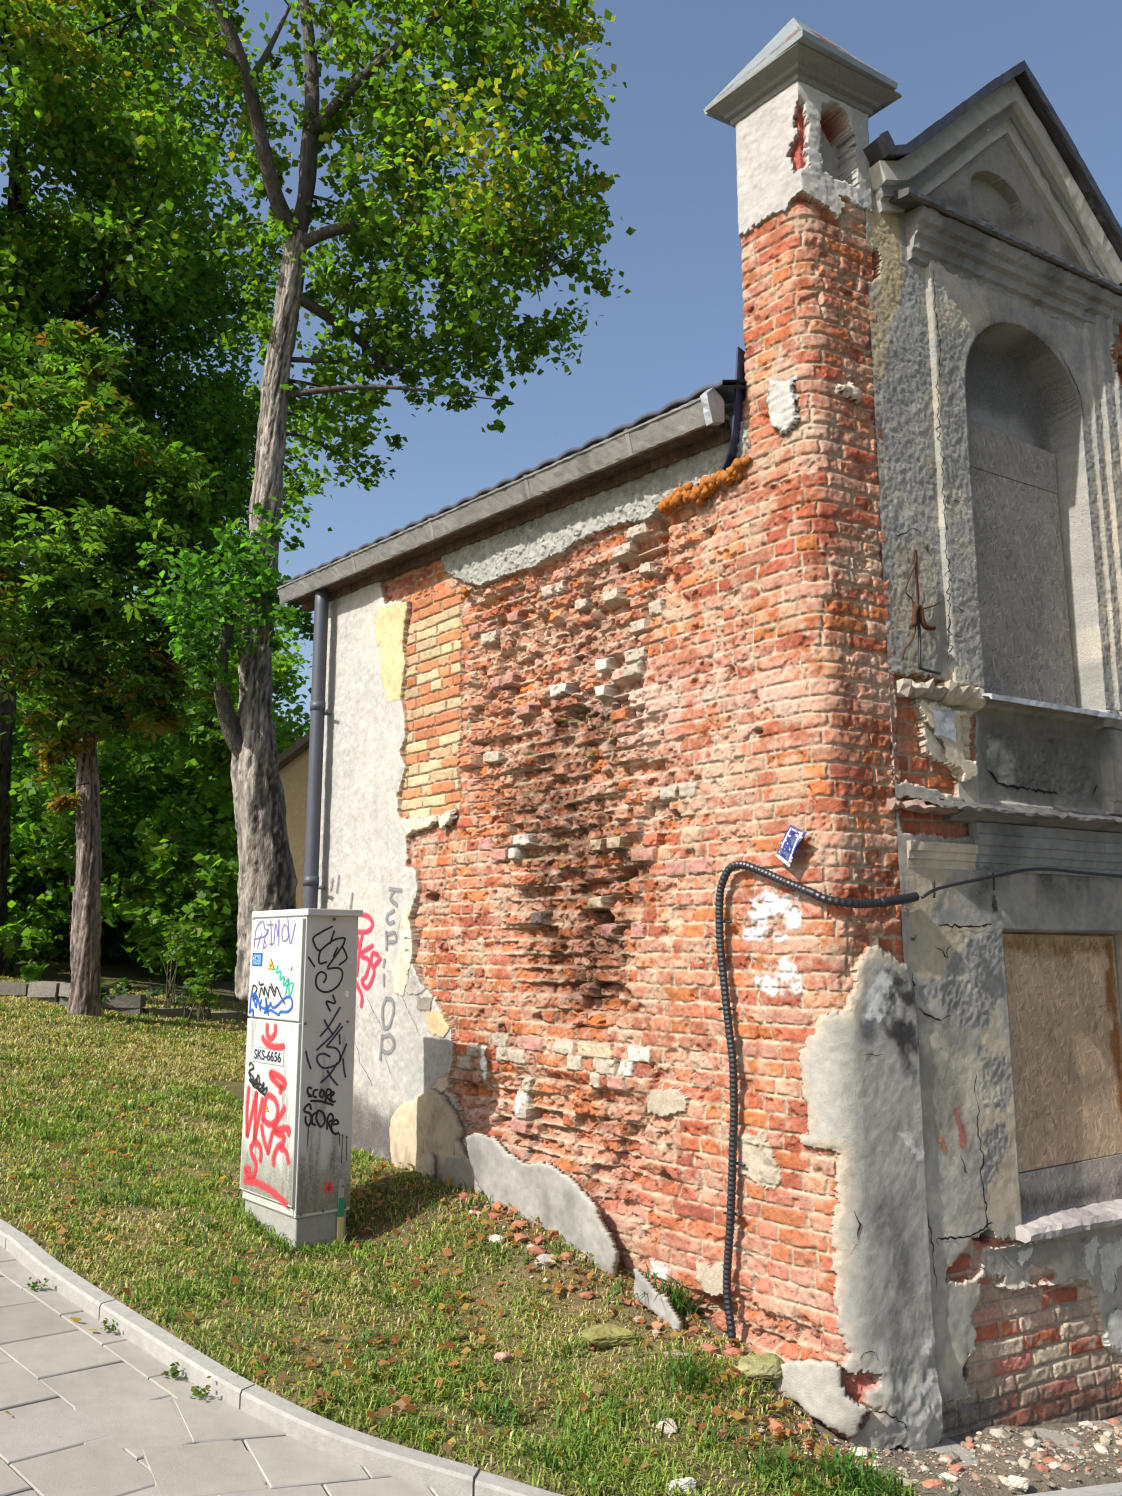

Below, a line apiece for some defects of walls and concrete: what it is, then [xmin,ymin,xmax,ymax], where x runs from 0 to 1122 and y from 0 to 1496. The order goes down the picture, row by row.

spalling [787,101,847,171]
flaking render [1111,324,1122,388]
crack [893,271,965,665]
spalling [375,190,969,1416]
flaking render [969,712,978,761]
crack [928,1076,992,1287]
flaking render [941,1227,1122,1438]